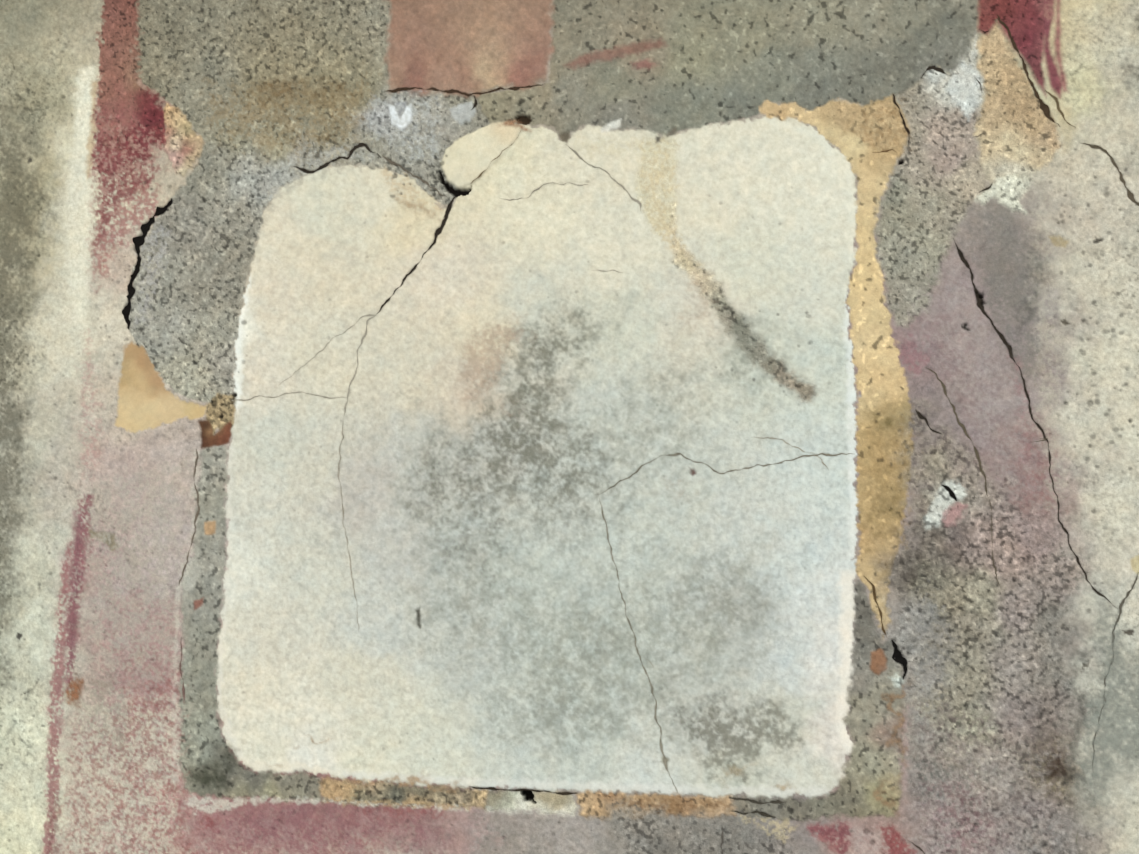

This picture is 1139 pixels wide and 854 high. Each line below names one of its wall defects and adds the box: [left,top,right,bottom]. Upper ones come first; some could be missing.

crack [122,198,172,330]
spalling [127,0,605,403]
crack [506,145,641,211]
crack [877,94,910,153]
crack [921,66,946,78]
crack [979,15,1139,205]
crack [232,135,519,626]
crack [595,437,851,790]
crack [916,367,1002,590]
crack [954,241,1138,780]